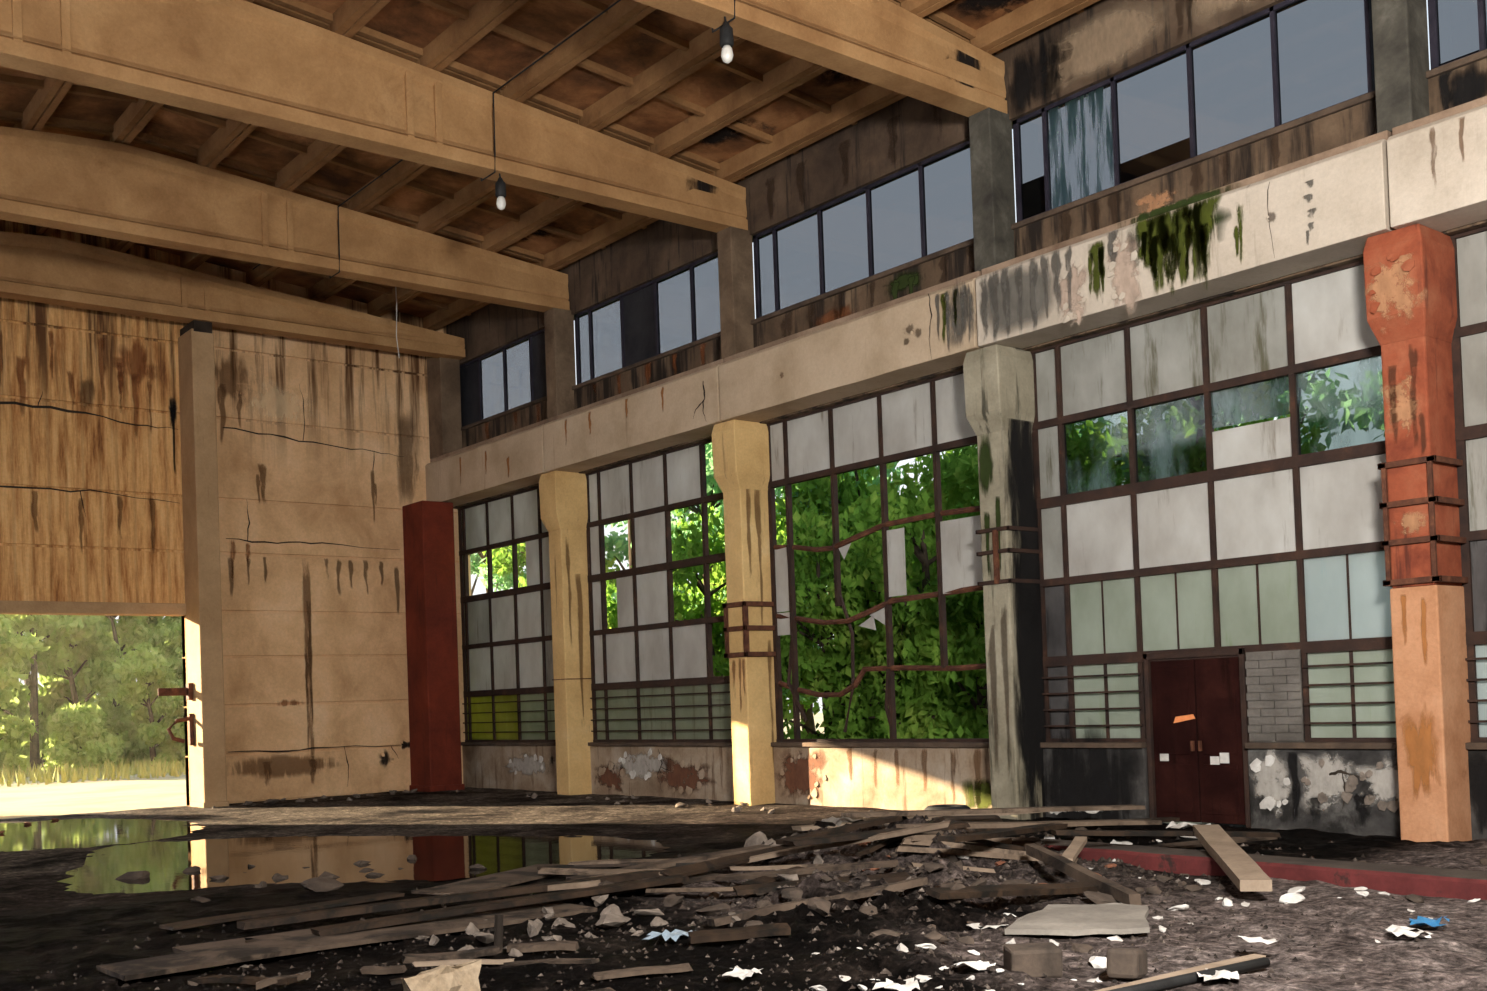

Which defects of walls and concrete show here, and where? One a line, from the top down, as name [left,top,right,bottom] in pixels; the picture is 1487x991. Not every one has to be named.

damp [1136,196,1221,293]
damp [935,230,1117,348]
peeling [1367,254,1422,318]
damp [0,333,26,412]
damp [98,339,124,400]
damp [215,363,246,439]
peeling [1384,376,1417,429]
damp [169,399,177,472]
damp [256,465,266,501]
damp [231,542,250,577]
spalling [596,748,713,796]
flaking render [1250,749,1399,813]